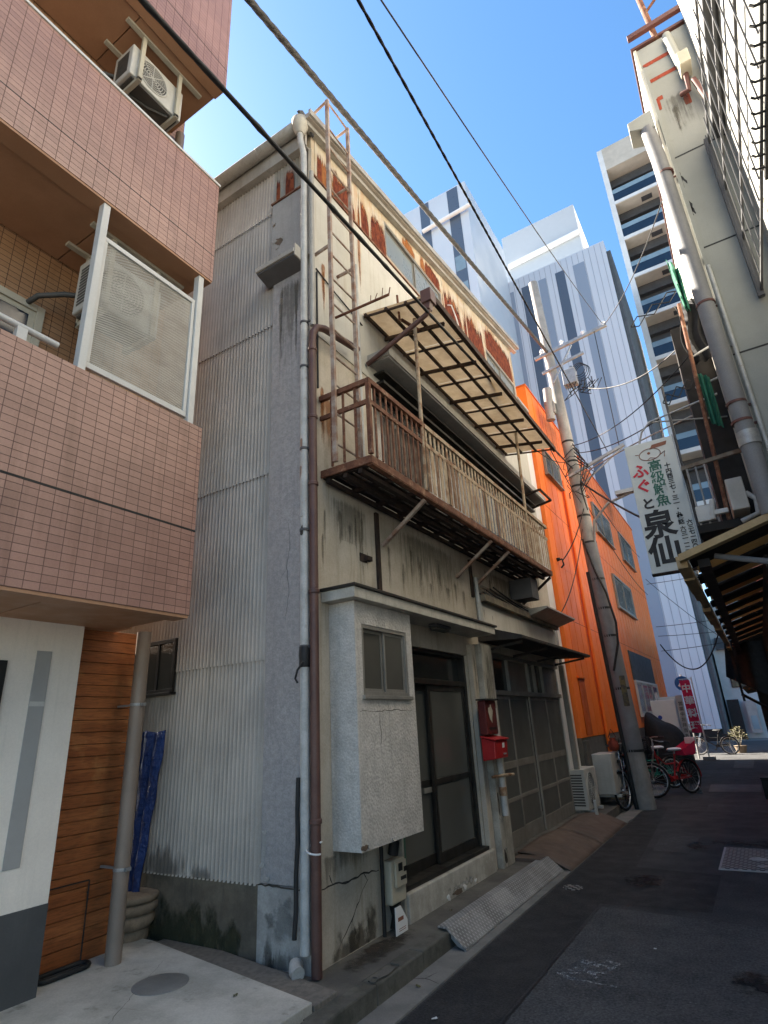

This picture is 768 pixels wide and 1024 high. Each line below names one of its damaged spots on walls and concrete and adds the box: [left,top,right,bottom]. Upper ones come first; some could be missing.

rust [276,171,294,201]
rust [317,156,386,273]
crack [258,870,379,948]